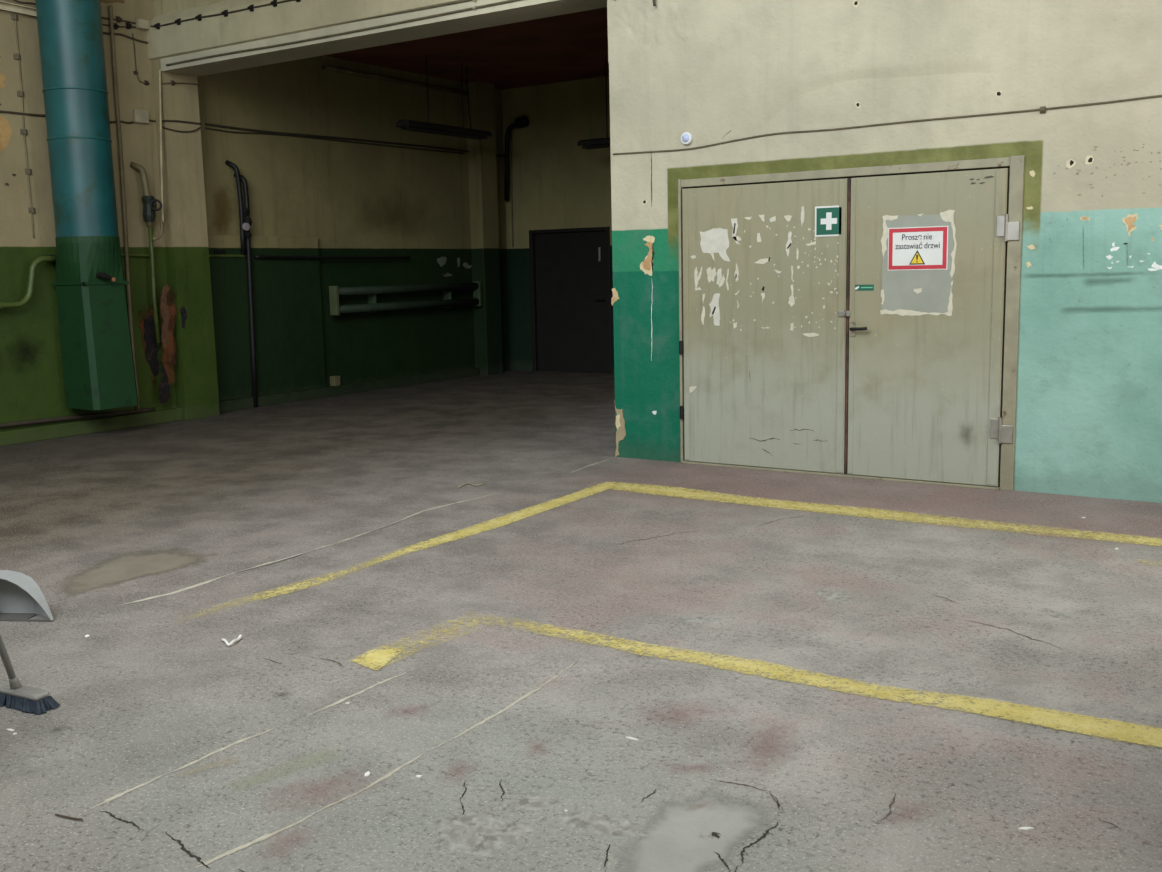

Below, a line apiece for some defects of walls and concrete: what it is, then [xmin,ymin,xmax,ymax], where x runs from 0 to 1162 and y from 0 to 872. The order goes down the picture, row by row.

spalling [1053,144,1162,197]
peeling [640,235,655,276]
peeling [1122,214,1138,237]
peeling [1106,225,1162,271]
rust [139,284,176,404]
flaking render [614,400,626,457]
crack [306,662,575,813]
crack [102,811,209,868]
crack [714,780,783,872]